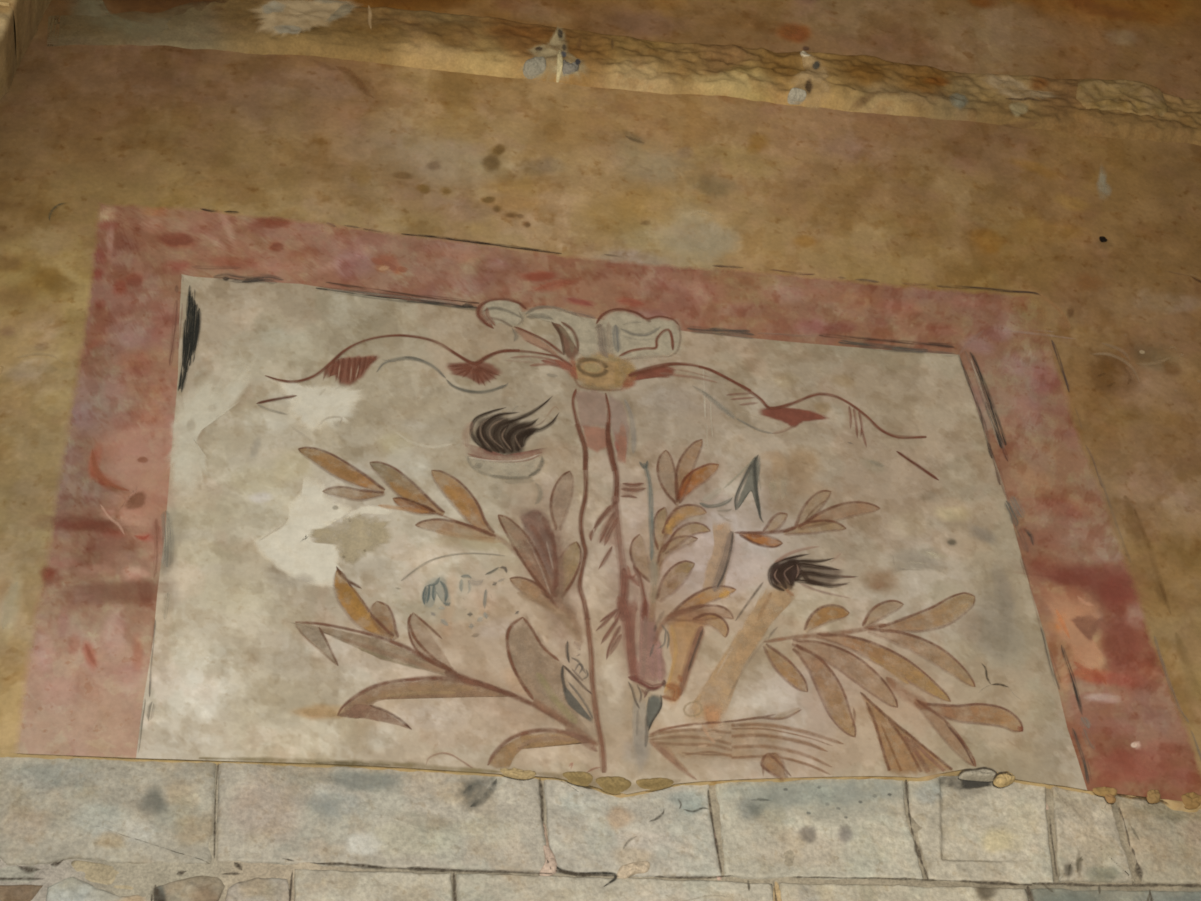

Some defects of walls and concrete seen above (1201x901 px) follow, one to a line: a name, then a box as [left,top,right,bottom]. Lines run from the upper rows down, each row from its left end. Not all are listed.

flaking render [257,0,355,34]
spalling [523,28,583,82]
spalling [787,46,829,109]
spalling [987,75,1054,115]
peeling [170,381,244,481]
peeling [258,483,388,583]